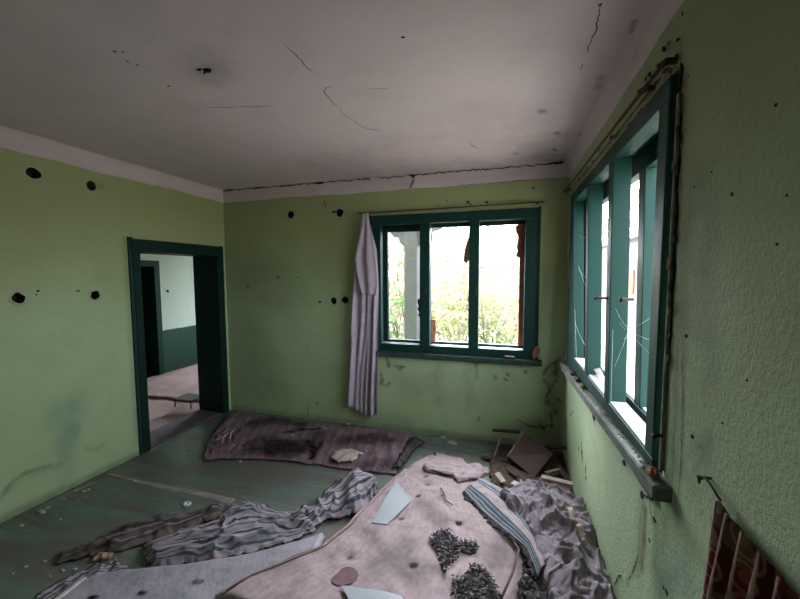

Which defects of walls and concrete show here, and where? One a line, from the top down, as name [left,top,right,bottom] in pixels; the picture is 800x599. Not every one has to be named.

crack [580,3,602,70]
crack [285,45,380,131]
flaking render [625,38,689,128]
crack [223,162,564,208]
flaking render [664,103,683,366]